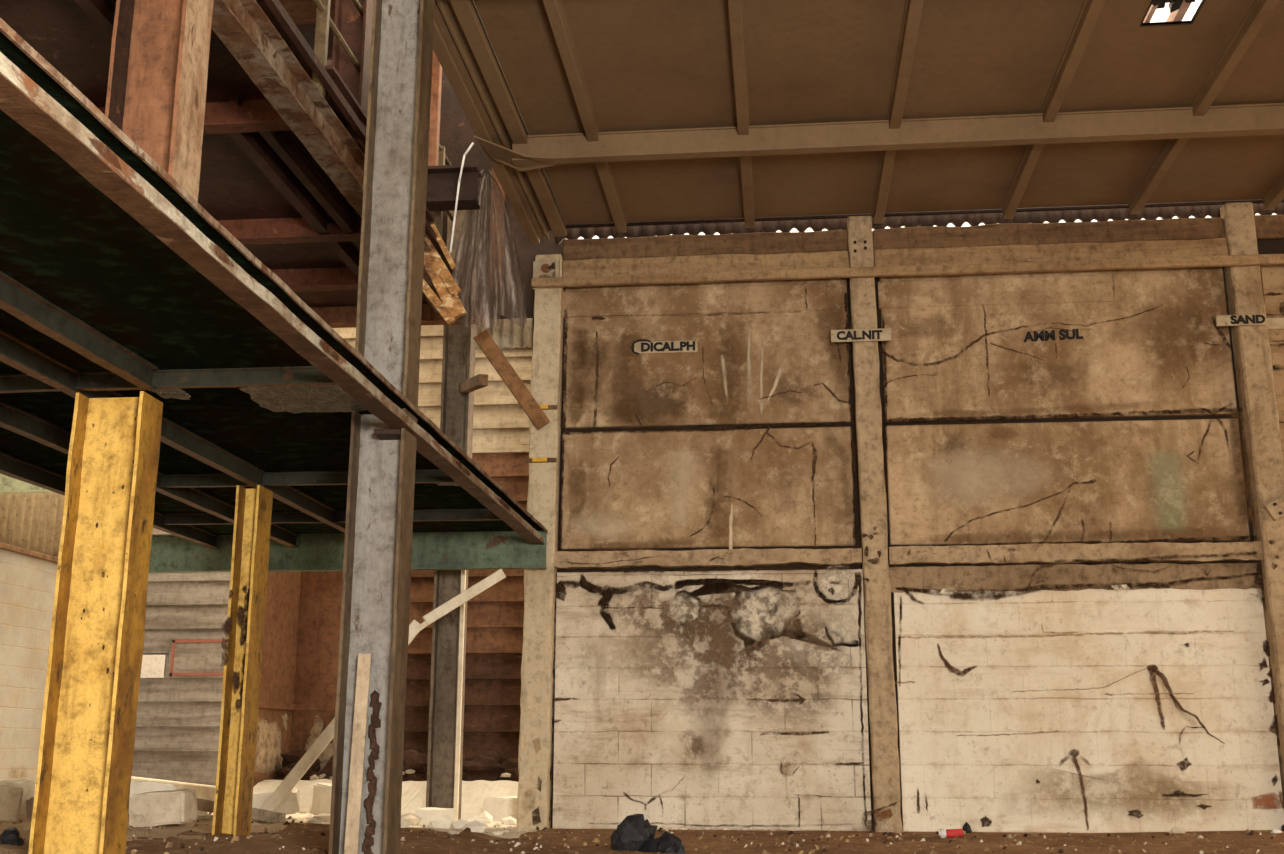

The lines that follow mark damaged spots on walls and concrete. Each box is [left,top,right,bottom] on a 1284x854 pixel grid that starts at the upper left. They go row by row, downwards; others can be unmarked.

corrosion [90,139,121,169]
crack [881,287,1155,396]
crack [556,488,810,629]
peeling [670,596,698,621]
leakage [629,591,796,701]
peeling [733,588,795,638]
crack [902,630,1233,744]
crack [945,480,1257,587]
leakage [691,738,703,754]